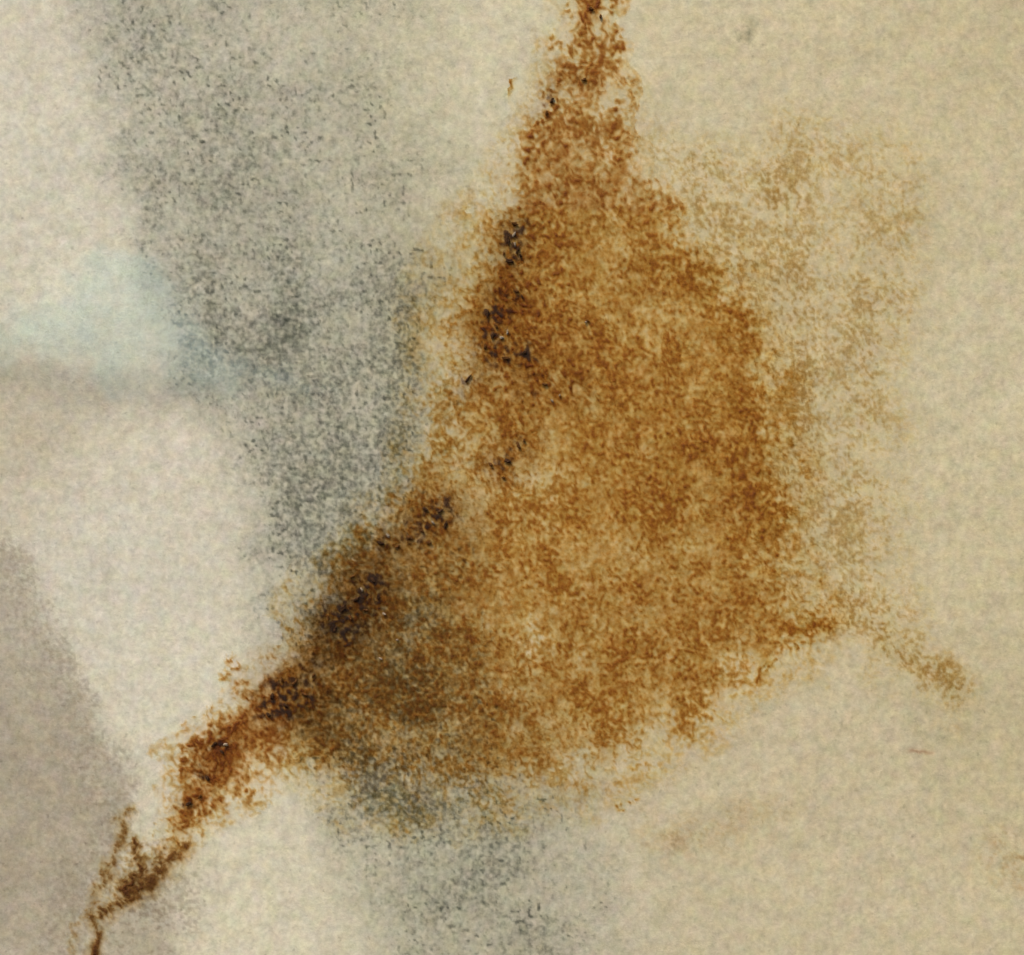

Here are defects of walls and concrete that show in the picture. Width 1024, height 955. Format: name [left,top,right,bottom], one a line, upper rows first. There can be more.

corrosion [169,0,831,830]